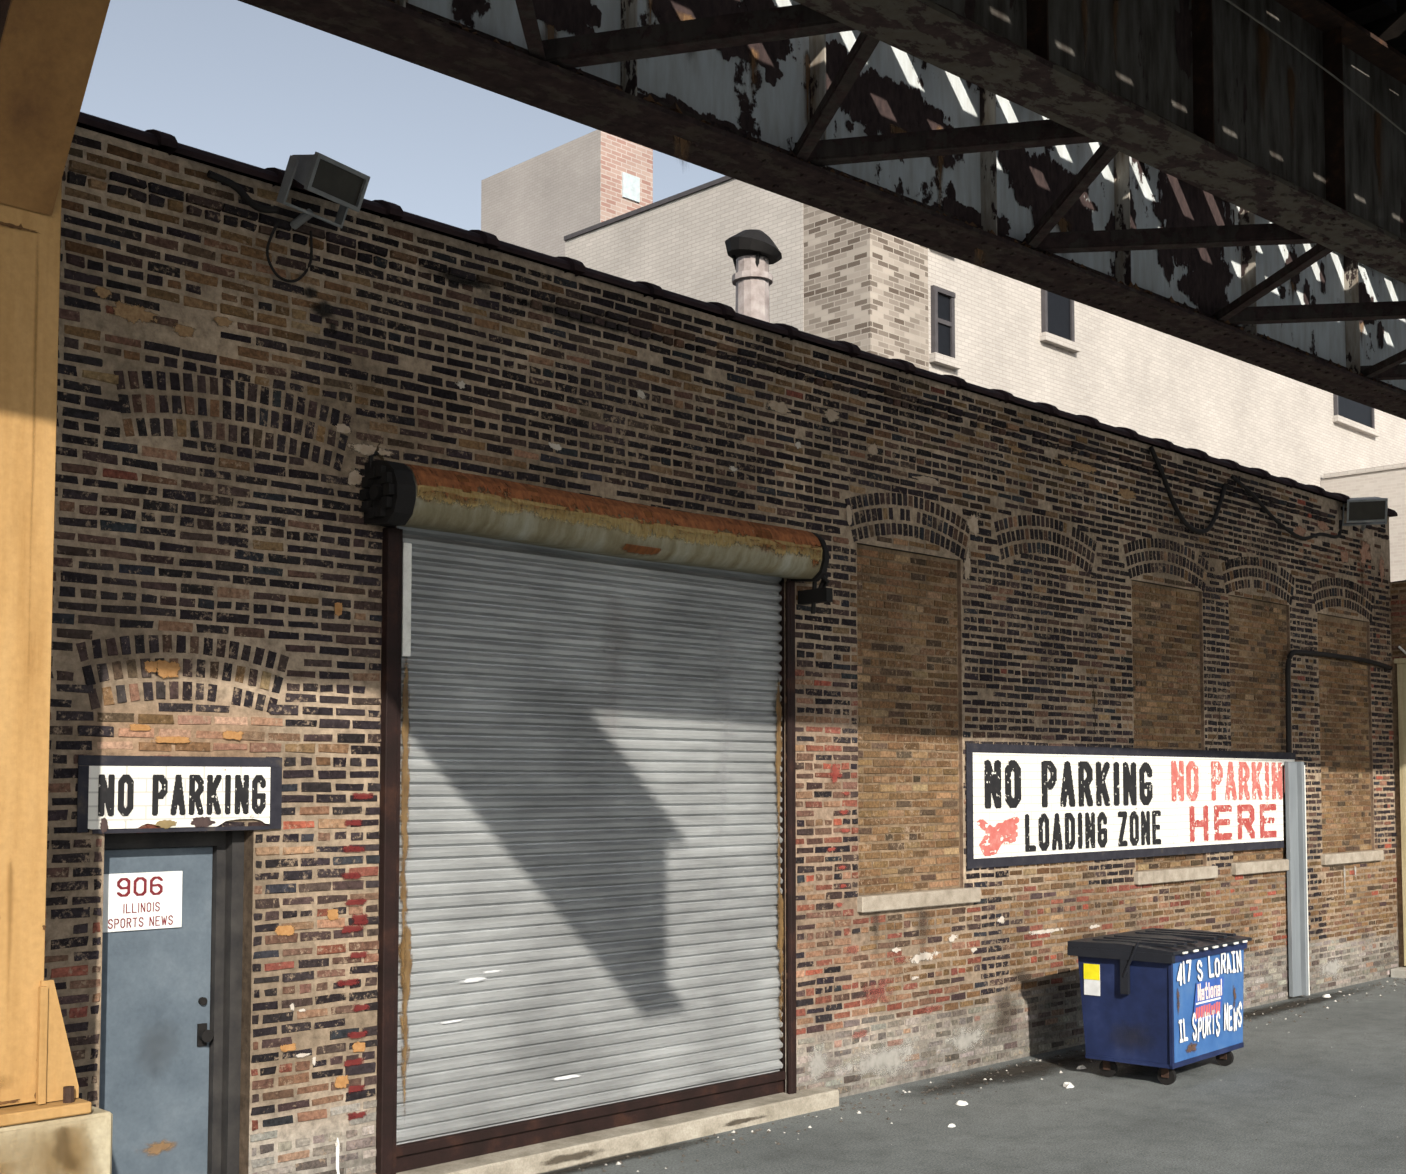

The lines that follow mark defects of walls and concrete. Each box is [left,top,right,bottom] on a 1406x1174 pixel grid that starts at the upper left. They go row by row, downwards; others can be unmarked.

peeling [532,0,602,36]
peeling [652,0,777,24]
peeling [716,39,805,87]
peeling [826,39,847,92]
peeling [840,67,954,136]
peeling [998,148,1137,232]
peeling [1154,171,1235,228]
peeling [1157,247,1233,315]
peeling [1279,248,1326,305]
peeling [1359,282,1374,303]
peeling [1359,320,1384,349]
corrosion [404,463,823,565]